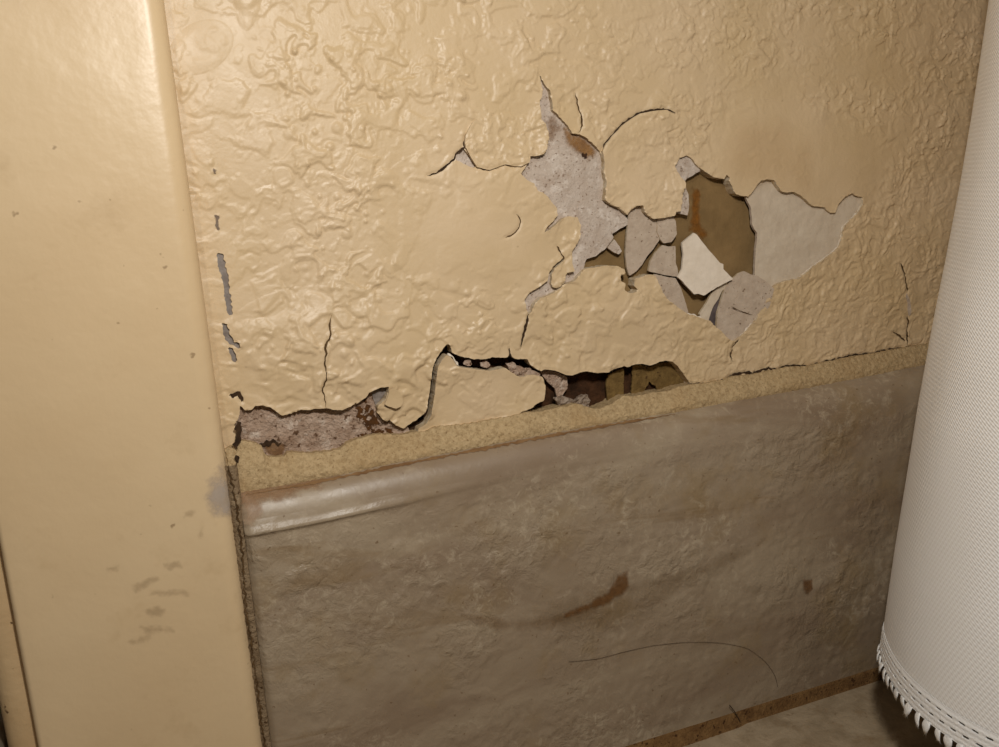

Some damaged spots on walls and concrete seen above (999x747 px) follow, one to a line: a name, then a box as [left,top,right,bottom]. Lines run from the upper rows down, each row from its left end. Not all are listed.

peeling [521,82,862,341]
crack [322,318,332,403]
spalling [234,346,684,456]